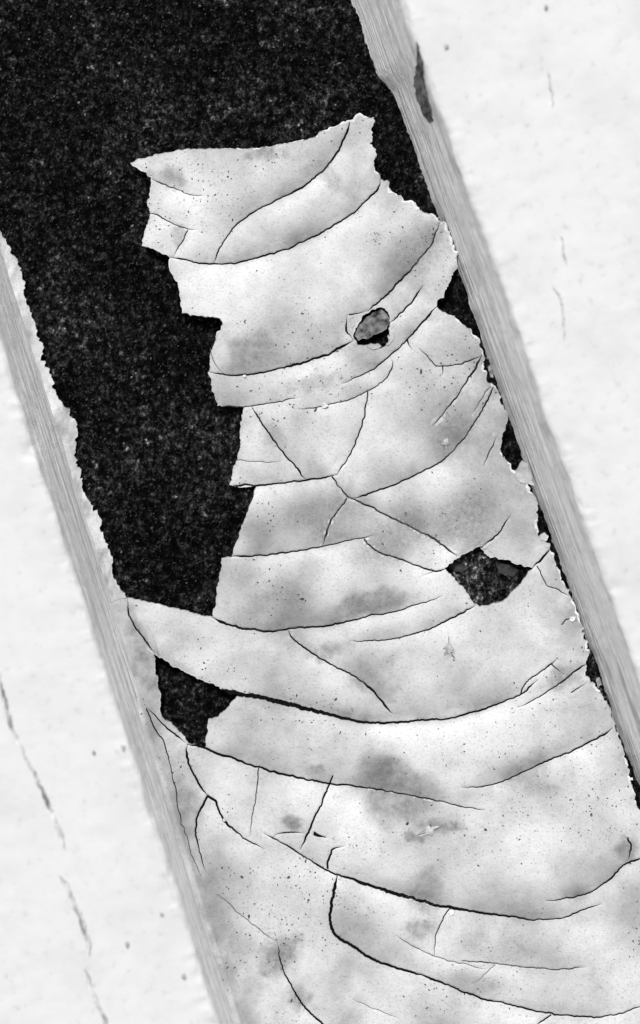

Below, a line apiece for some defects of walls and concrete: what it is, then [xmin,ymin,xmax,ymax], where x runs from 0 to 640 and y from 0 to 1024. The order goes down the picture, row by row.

spalling [413,42,434,123]
crack [149,121,381,265]
peeling [0,231,127,602]
crack [210,223,495,576]
crack [127,599,153,651]
peeling [110,113,640,1024]
crack [212,598,586,724]
crack [483,516,510,546]
crack [532,546,577,625]
crack [0,679,64,849]
crack [146,708,640,1024]
crack [58,874,107,1024]